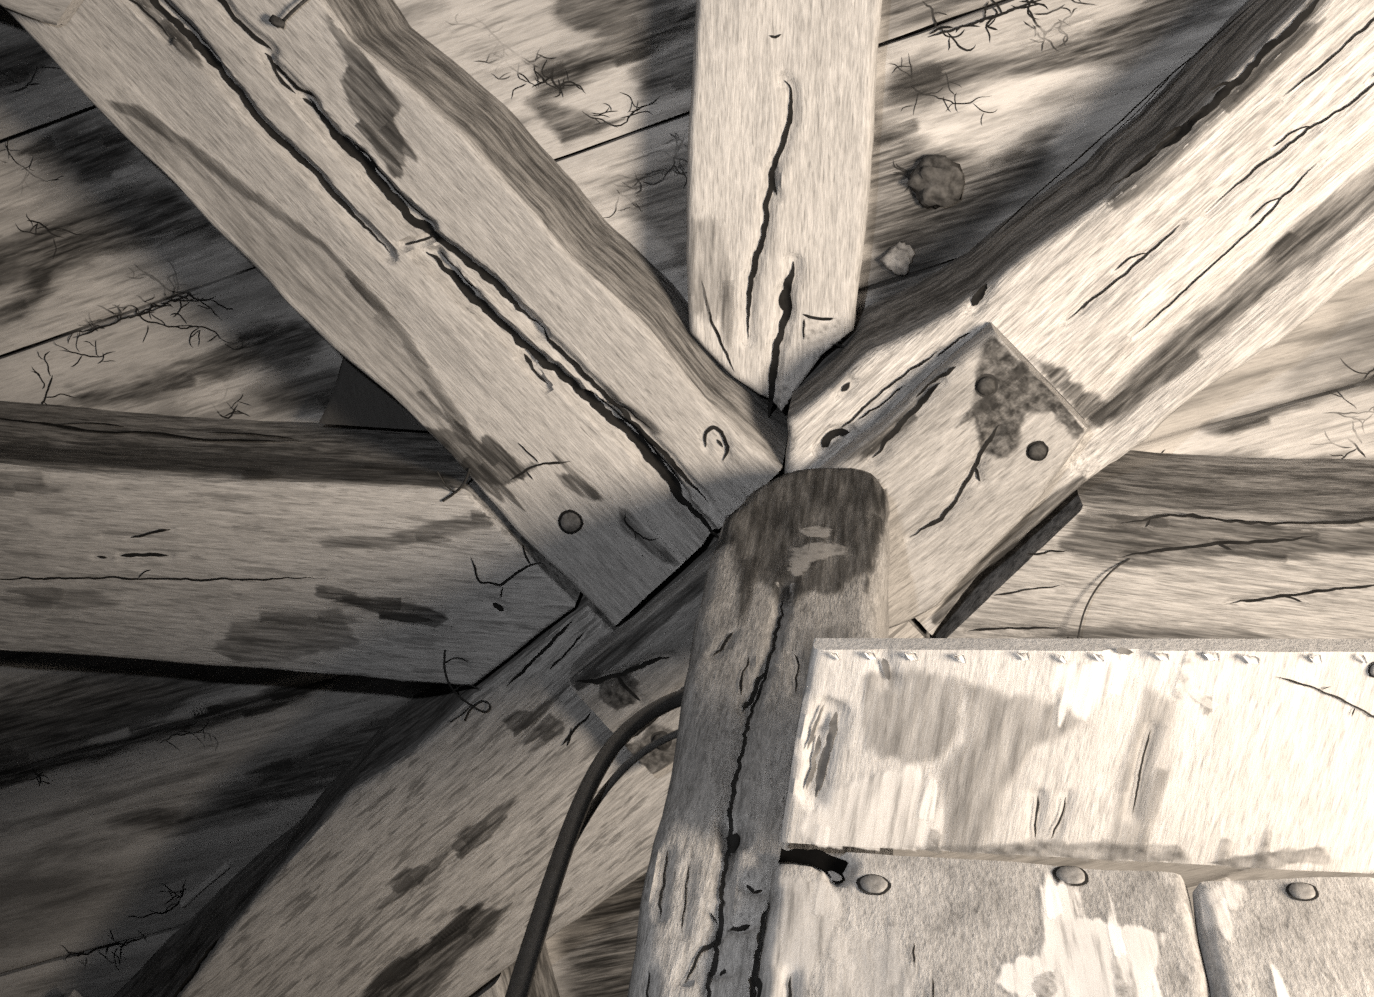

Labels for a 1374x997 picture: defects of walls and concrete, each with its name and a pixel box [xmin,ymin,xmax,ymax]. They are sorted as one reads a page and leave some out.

crack [130,0,719,541]
crack [702,81,843,417]
crack [975,0,1257,252]
crack [1106,0,1319,192]
crack [1069,75,1374,335]
crack [1284,18,1374,96]
leakage [557,457,601,500]
leakage [713,407,916,616]
leakage [504,572,707,750]
crack [658,597,800,997]
peeling [1009,872,1163,997]
peeling [1272,965,1288,997]